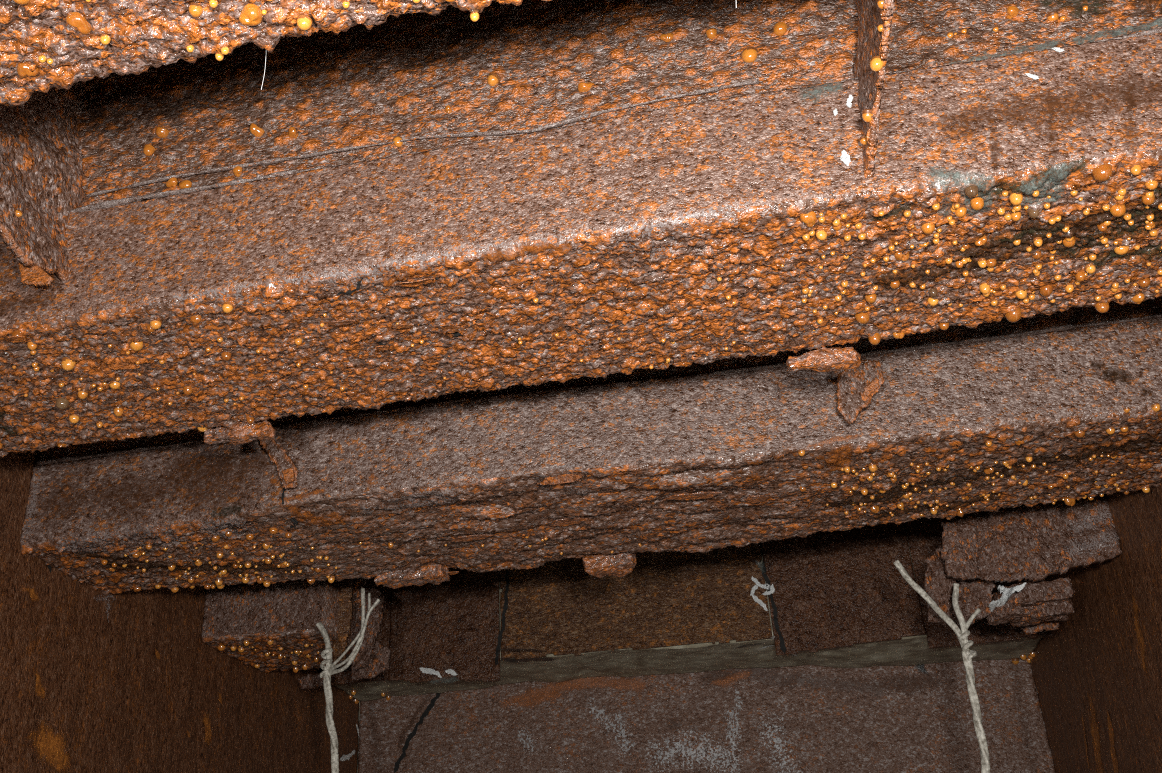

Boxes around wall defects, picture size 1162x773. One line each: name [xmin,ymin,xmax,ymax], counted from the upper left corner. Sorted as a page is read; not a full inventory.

corrosion [945,81,1162,138]
corrosion [484,240,571,262]
corrosion [0,262,55,312]
corrosion [861,377,879,401]
corrosion [807,435,858,472]
corrosion [271,468,345,527]
corrosion [537,474,583,485]
corrosion [29,721,69,771]